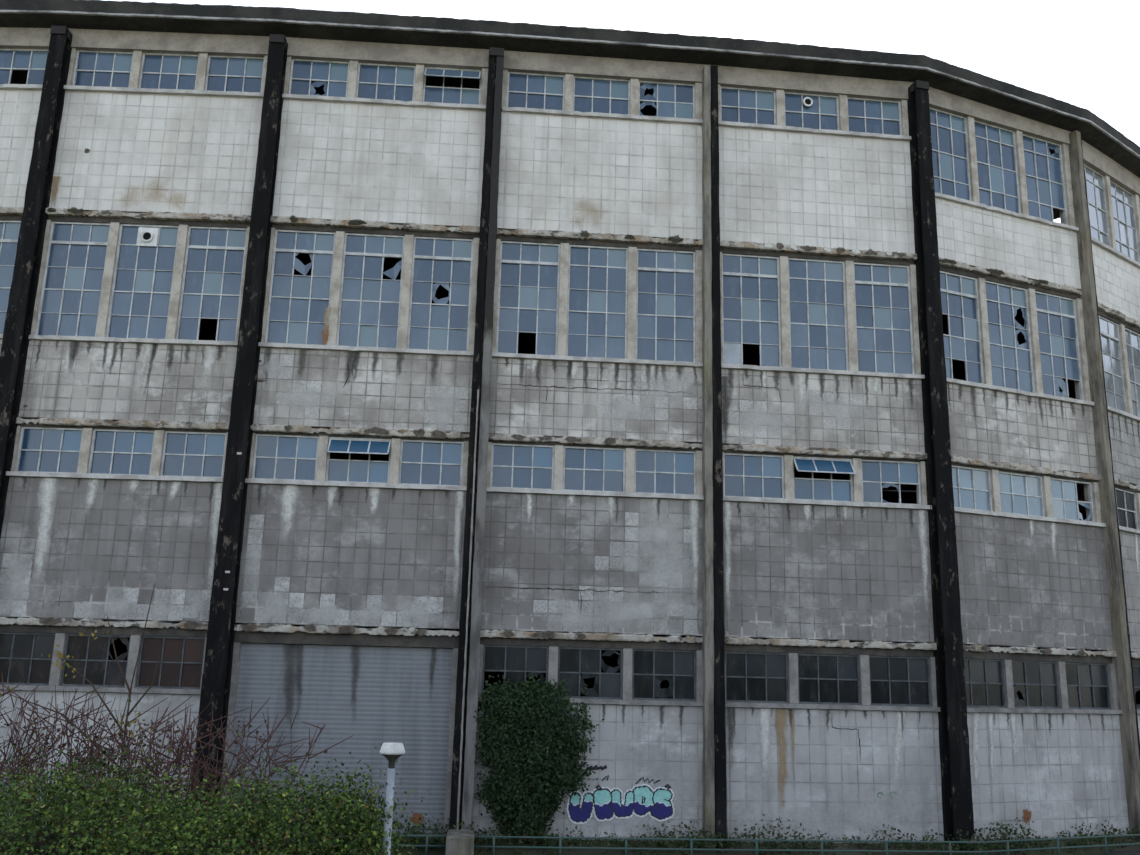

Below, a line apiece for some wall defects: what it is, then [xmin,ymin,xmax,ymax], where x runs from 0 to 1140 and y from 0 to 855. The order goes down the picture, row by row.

spalling [764,242,906,257]
damp [56,341,123,374]
damp [137,343,222,385]
damp [346,352,360,377]
damp [506,358,697,388]
damp [35,478,56,578]
damp [209,483,223,584]
damp [282,485,297,531]
damp [312,486,343,506]
damp [366,488,379,511]
damp [446,491,464,592]
rust [776,709,794,792]